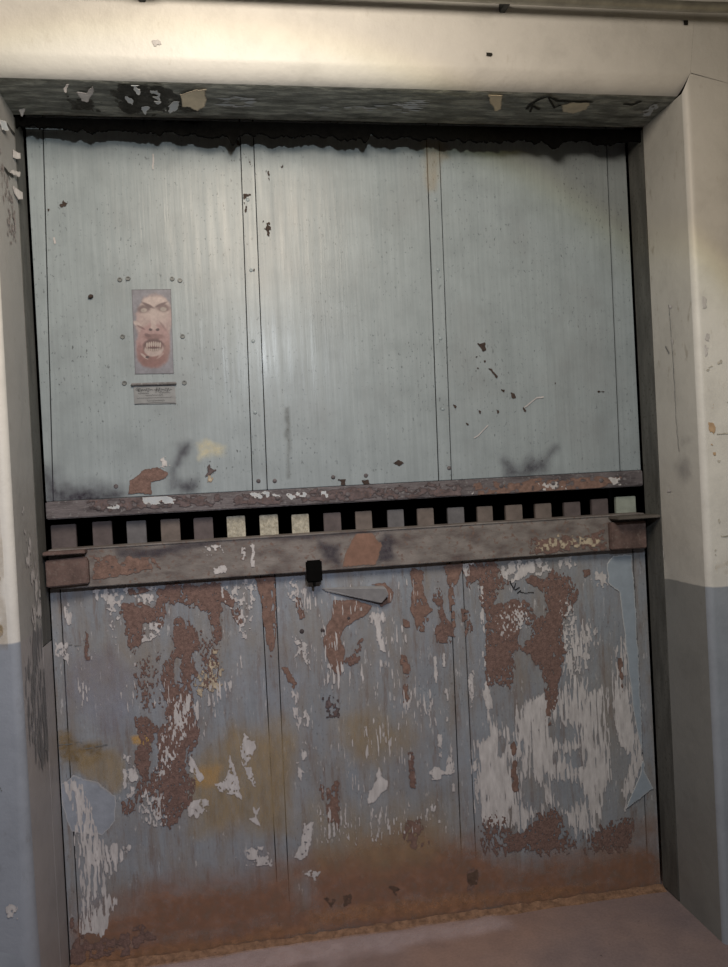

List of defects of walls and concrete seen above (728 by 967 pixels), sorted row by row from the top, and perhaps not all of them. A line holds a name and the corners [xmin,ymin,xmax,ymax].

spalling [64,84,256,116]
peeling [61,648,242,938]
rust [119,582,243,830]
peeling [215,733,256,800]
rust [87,467,622,512]
rust [323,532,392,567]
rust [323,582,394,675]
peeling [288,578,455,860]
rust [403,559,590,726]
peeling [500,534,601,583]
peeling [468,554,653,839]
rust [70,807,660,965]